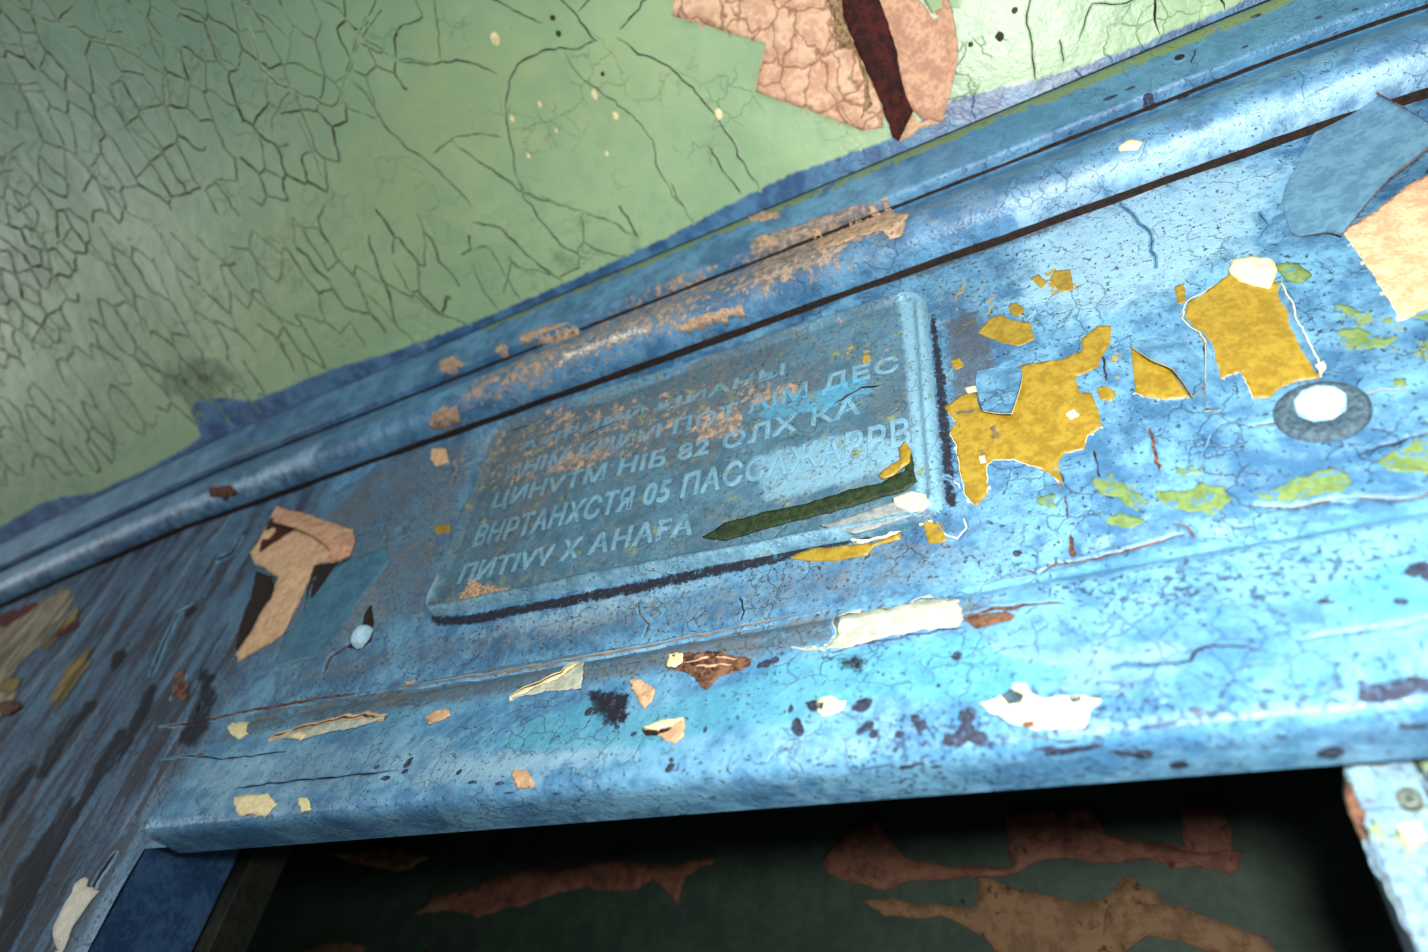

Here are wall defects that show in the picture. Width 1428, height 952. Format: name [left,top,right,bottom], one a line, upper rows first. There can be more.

peeling [667,0,960,142]
crack [0,0,762,515]
peeling [1283,92,1428,350]
peeling [944,256,1326,508]
crack [1017,449,1201,576]
crack [1141,427,1170,474]
peeling [236,506,391,668]
peeling [666,651,751,690]
peeling [790,594,1066,656]
peeling [979,682,1101,730]
crack [1108,641,1271,671]
peeling [53,877,100,952]